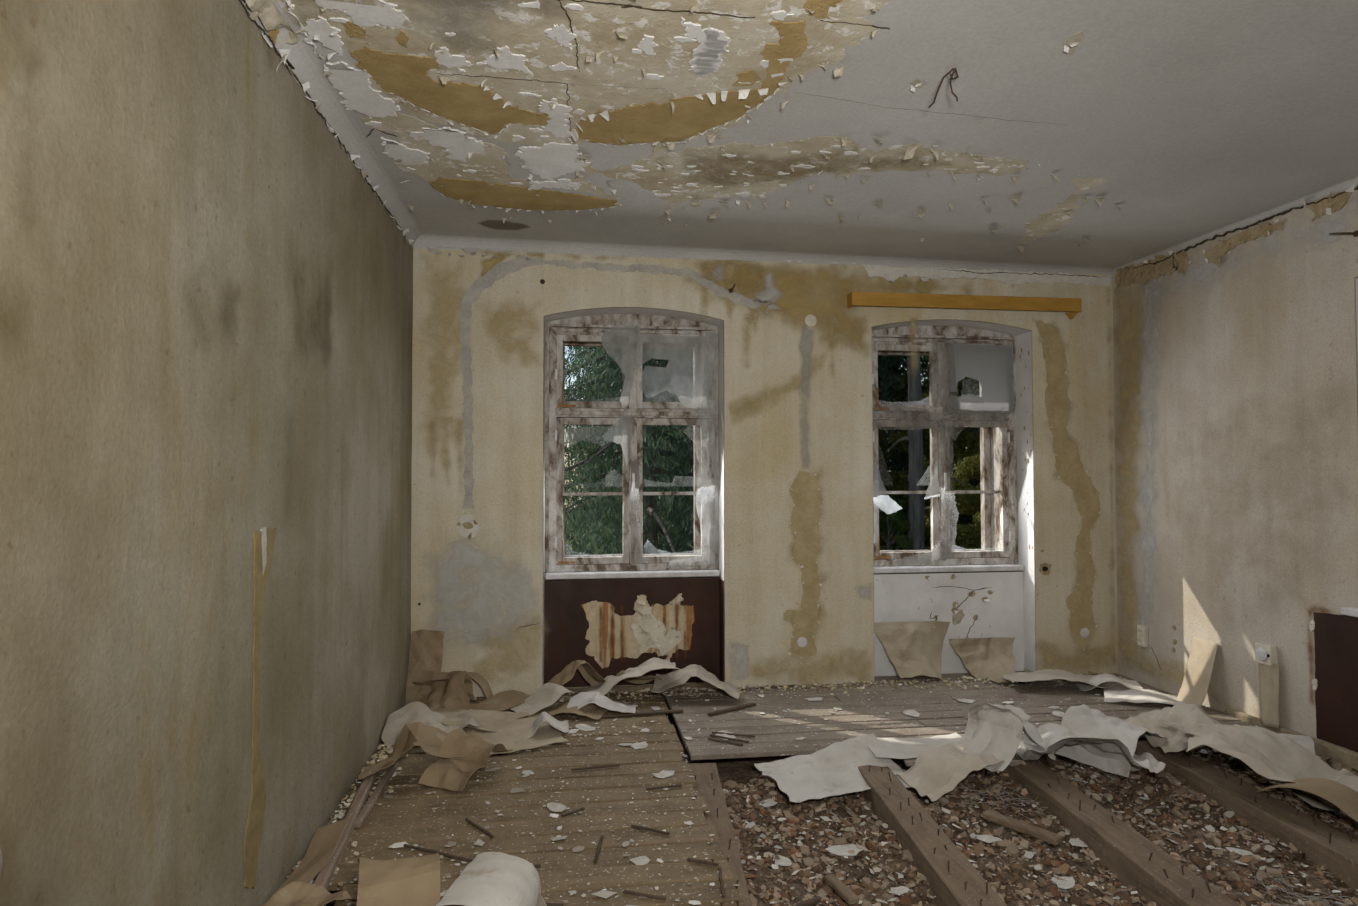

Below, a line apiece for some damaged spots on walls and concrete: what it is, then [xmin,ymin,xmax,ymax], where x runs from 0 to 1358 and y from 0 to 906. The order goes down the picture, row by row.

crack [438,0,756,131]
peeling [245,0,1121,253]
crack [821,20,890,30]
peeling [833,219,1284,292]
flaking render [1303,184,1356,222]
peeling [1020,320,1100,651]
peeling [783,468,824,659]
peeling [582,593,695,668]